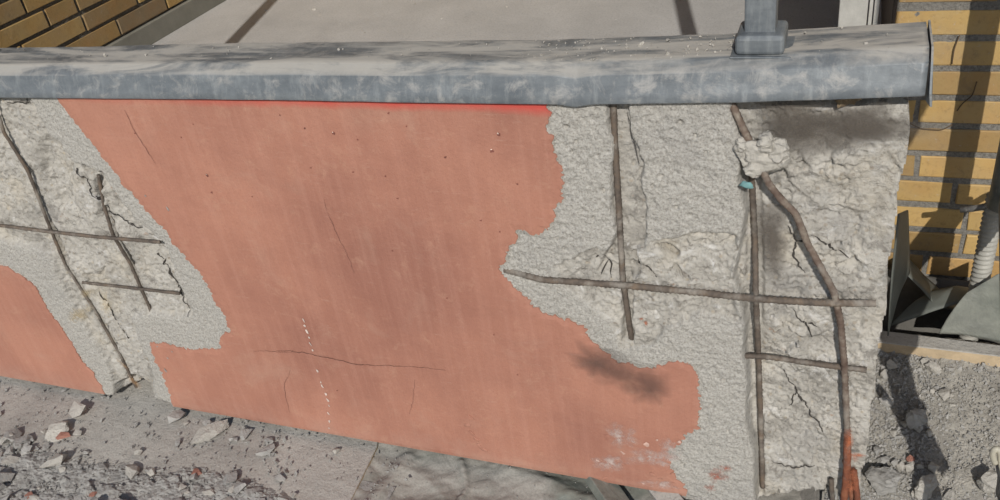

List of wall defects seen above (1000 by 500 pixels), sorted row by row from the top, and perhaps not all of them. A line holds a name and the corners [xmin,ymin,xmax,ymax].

spalling [0,98,230,404]
crack [270,350,441,414]
spalling [499,97,910,500]